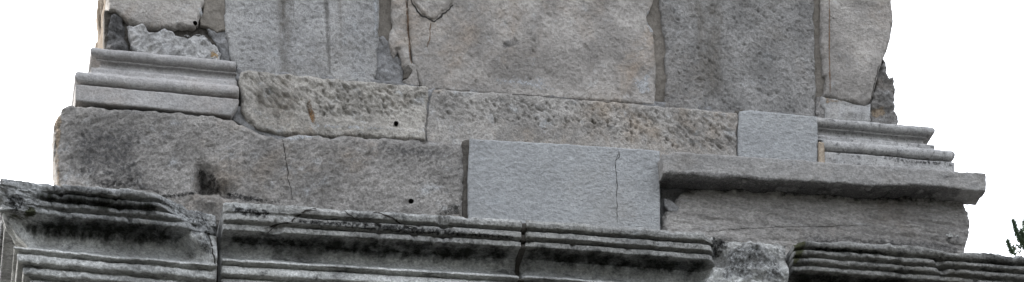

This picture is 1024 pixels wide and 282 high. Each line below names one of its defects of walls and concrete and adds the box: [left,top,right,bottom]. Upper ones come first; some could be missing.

leakage [8,132,273,244]
crack [267,139,316,233]
crack [345,211,420,230]
spalling [722,244,782,280]